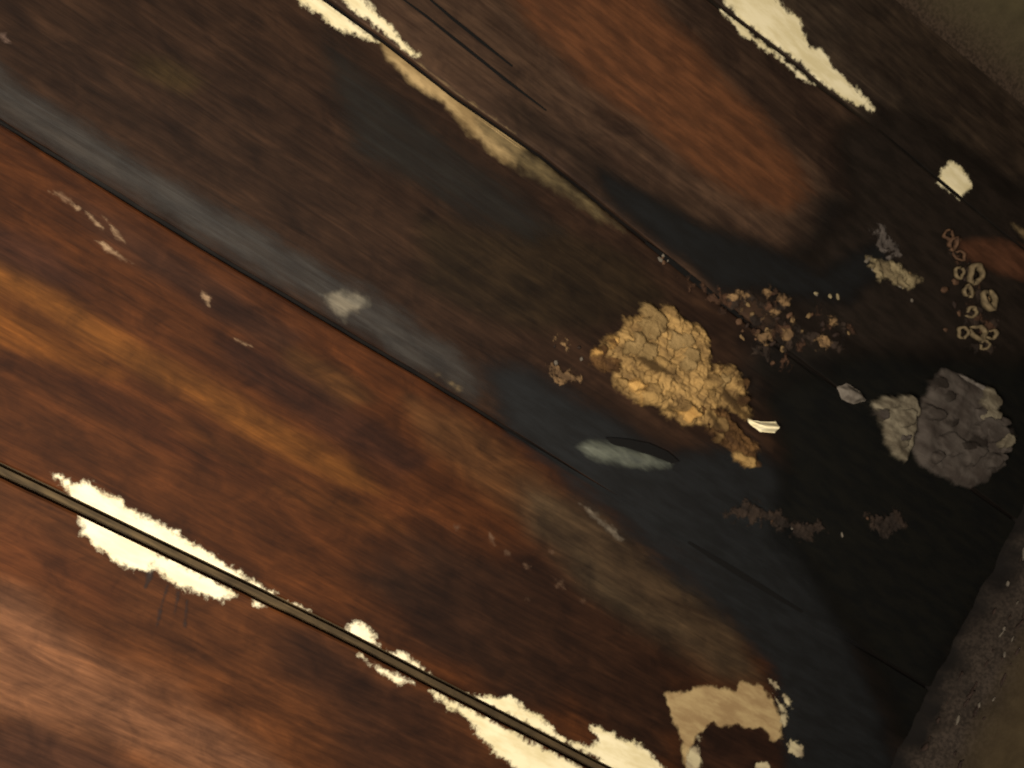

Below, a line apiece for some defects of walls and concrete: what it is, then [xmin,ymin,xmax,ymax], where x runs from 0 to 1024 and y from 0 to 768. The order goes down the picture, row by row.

crack [403,0,546,111]
peeling [720,0,875,111]
peeling [299,0,600,214]
peeling [937,161,972,201]
peeling [864,223,921,302]
peeling [941,229,1002,355]
peeling [54,474,273,600]
peeling [347,622,376,644]
peeling [377,668,414,684]
peeling [393,651,424,670]
peeling [428,690,662,768]
peeling [665,679,804,768]